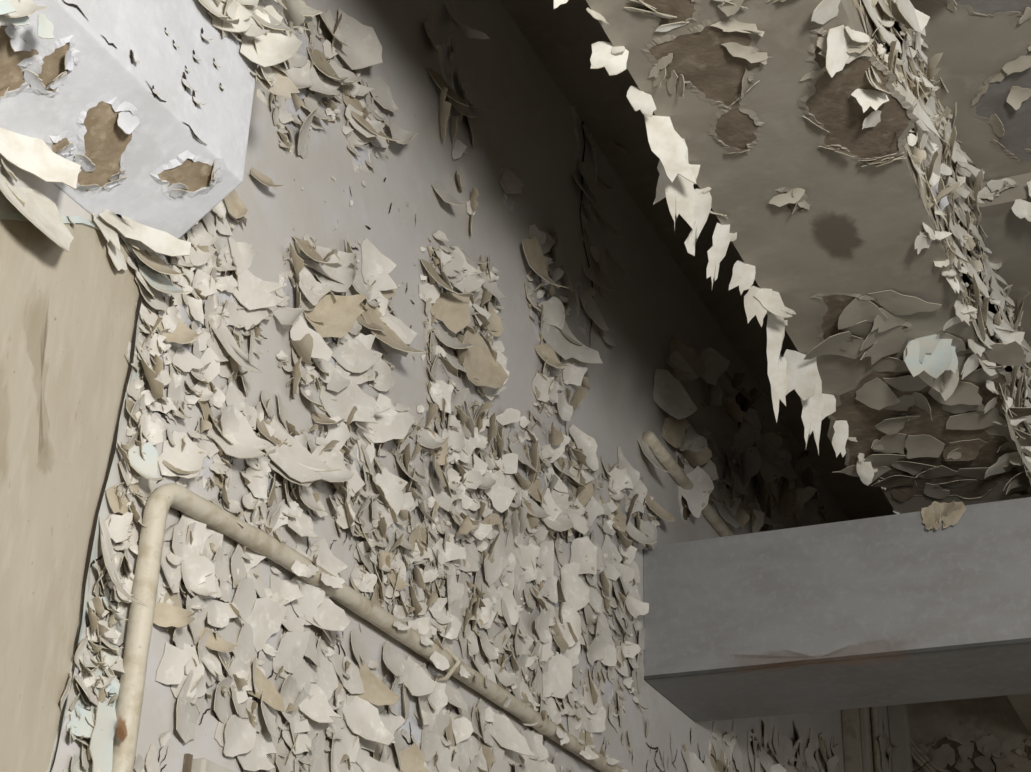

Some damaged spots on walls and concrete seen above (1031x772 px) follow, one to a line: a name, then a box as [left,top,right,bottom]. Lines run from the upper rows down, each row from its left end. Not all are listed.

spalling [0,0,81,103]
peeling [182,0,419,206]
peeling [586,7,609,25]
peeling [590,0,773,286]
flaking render [0,94,675,772]
peeling [670,720,840,772]
peeling [912,734,1031,772]